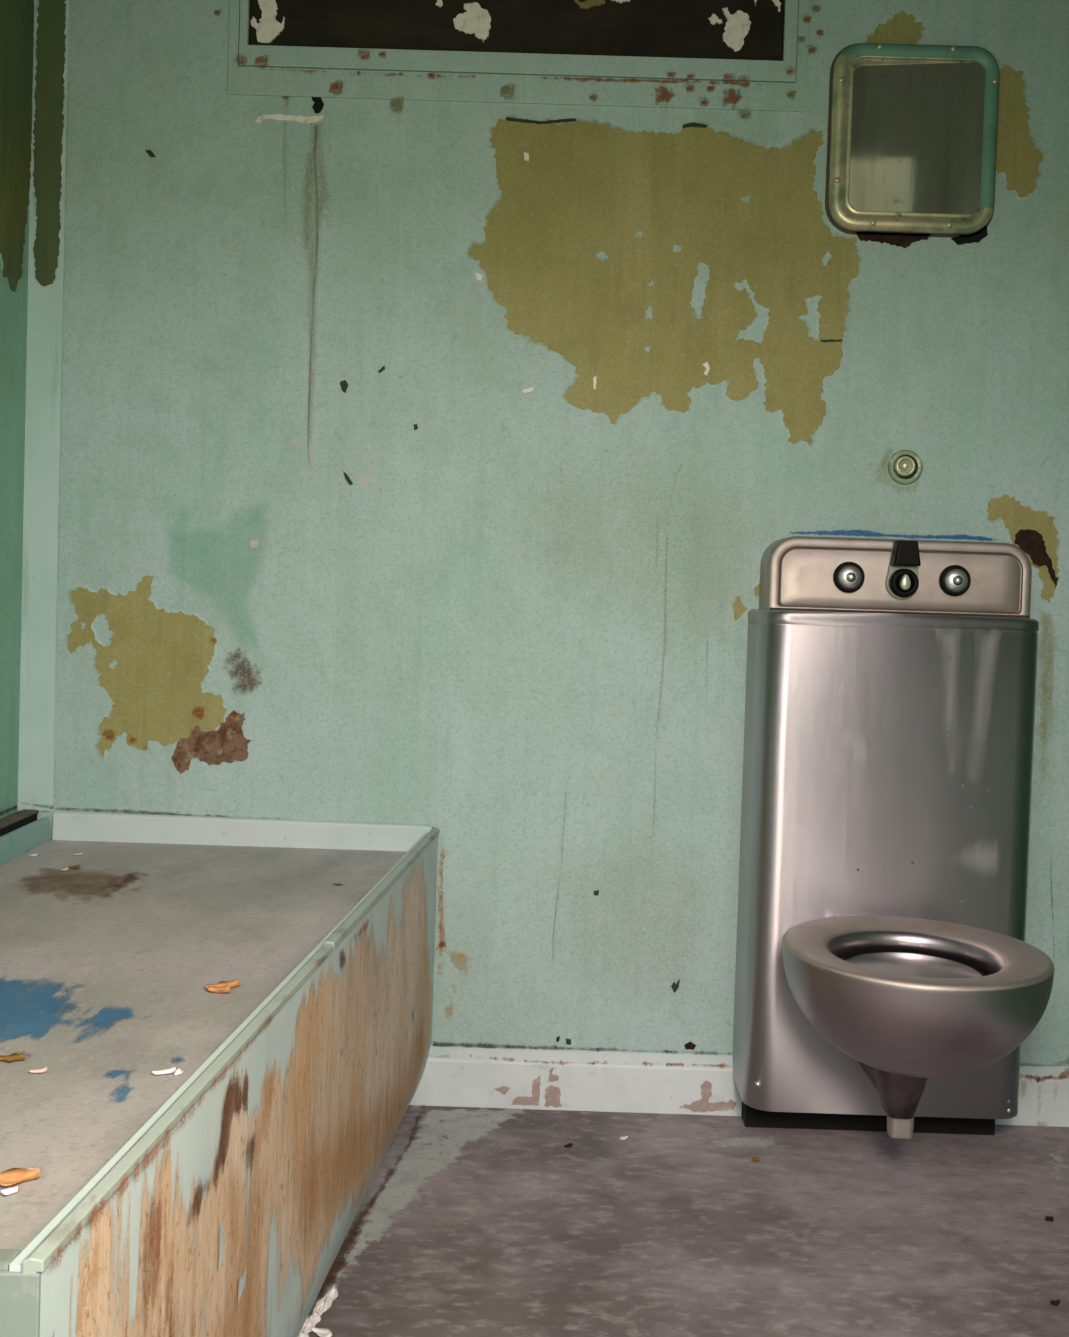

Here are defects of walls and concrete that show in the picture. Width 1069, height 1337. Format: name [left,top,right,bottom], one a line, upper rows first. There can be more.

peeling [0,0,69,295]
rust [235,48,485,97]
rust [500,65,796,120]
peeling [996,63,1045,200]
peeling [465,115,863,449]
peeling [985,494,1061,605]
peeling [65,576,252,774]
damp [12,865,151,904]
rust [51,849,470,1337]
peeling [494,1068,563,1108]
rust [643,1042,729,1069]
rust [1019,1067,1069,1126]